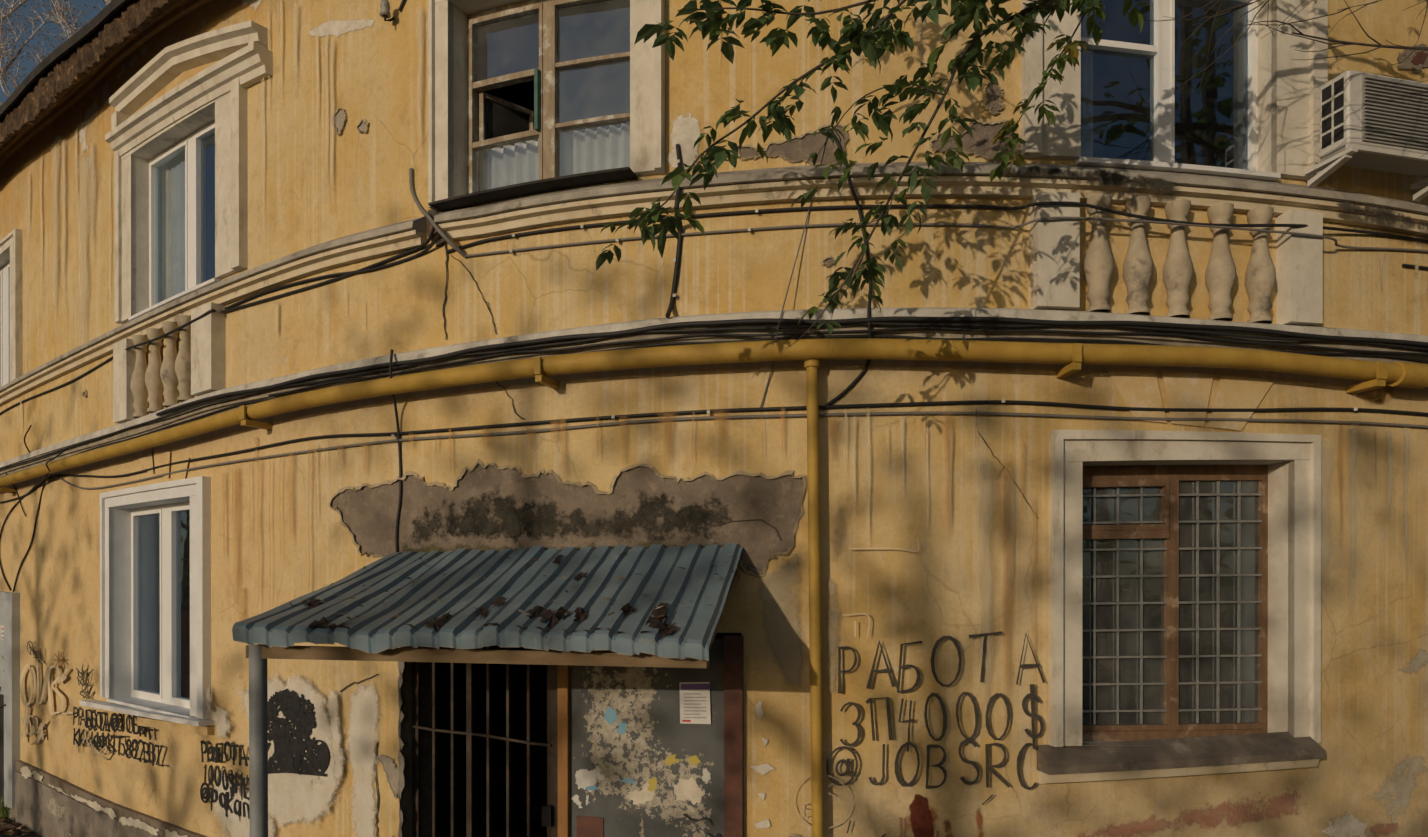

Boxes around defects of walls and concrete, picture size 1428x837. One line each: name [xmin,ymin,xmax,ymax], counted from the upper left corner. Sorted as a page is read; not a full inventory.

peeling [308,19,375,37]
flaking render [329,459,808,578]
peeling [346,682,399,837]
peeling [749,737,776,775]
peeling [21,766,188,837]
rust [908,795,953,837]
peeling [1078,793,1298,837]
peeling [1322,814,1398,837]